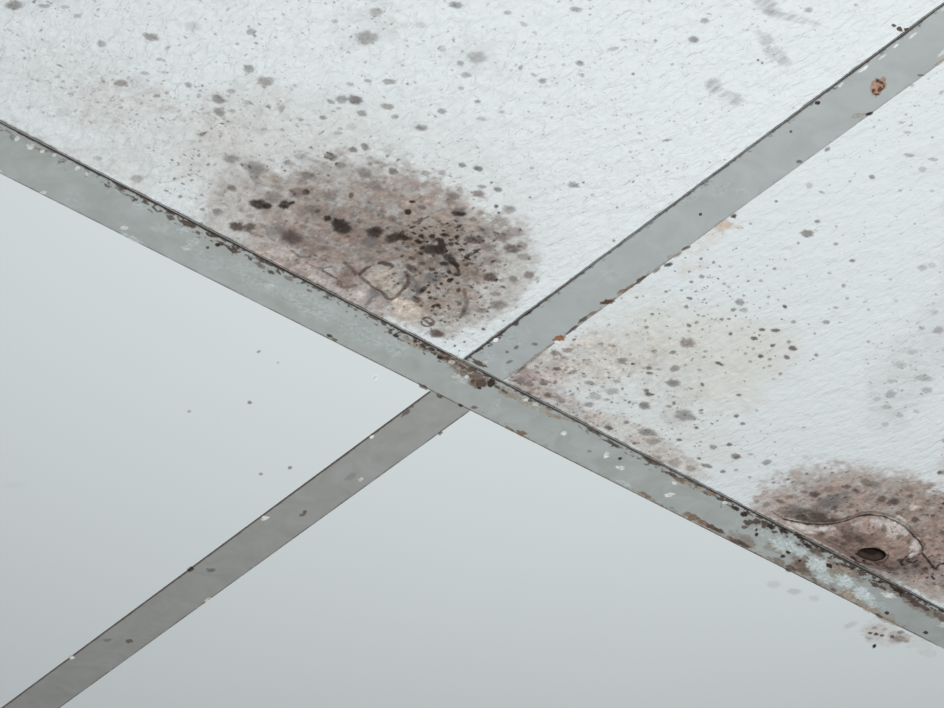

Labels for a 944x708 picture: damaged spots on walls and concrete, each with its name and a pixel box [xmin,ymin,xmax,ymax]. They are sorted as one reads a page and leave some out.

corrosion [871,77,886,97]
leakage [230,169,518,337]
corrosion [553,246,691,341]
corrosion [419,344,515,397]
leakage [509,339,601,400]
peeling [722,501,944,634]
leakage [754,470,944,599]